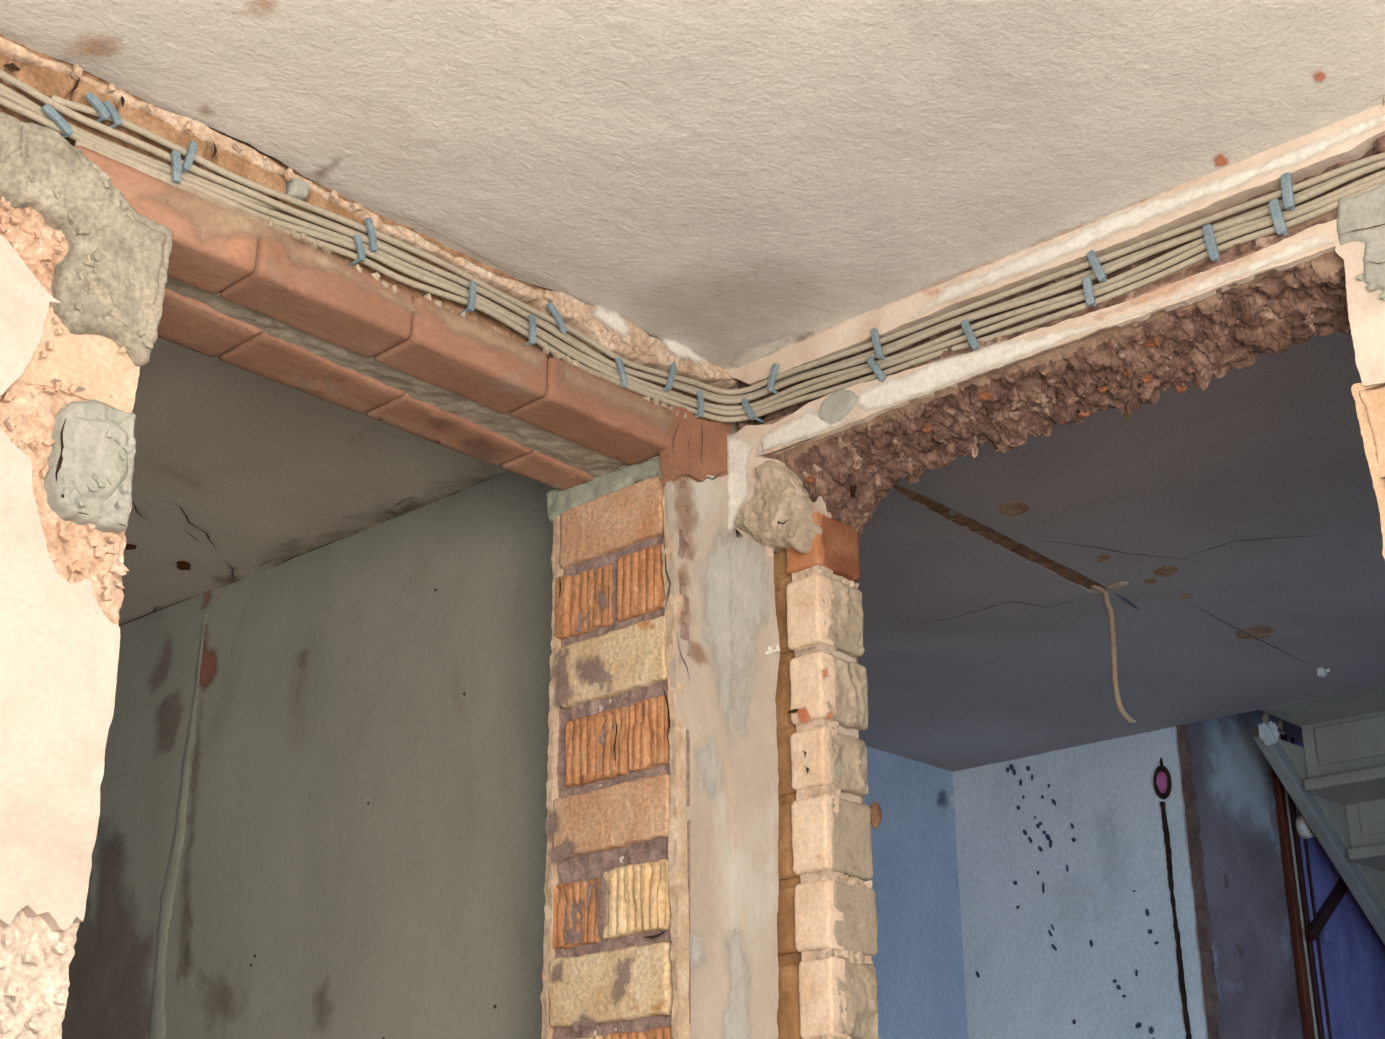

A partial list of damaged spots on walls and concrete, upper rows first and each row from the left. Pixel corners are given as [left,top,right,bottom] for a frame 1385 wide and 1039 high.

flaking render [0,34,1385,432]
flaking render [0,196,140,626]
crack [132,492,459,580]
crack [916,596,1089,625]
crack [1046,534,1333,562]
crack [1188,602,1305,663]
flaking render [1351,383,1385,559]
peeling [0,835,151,1039]